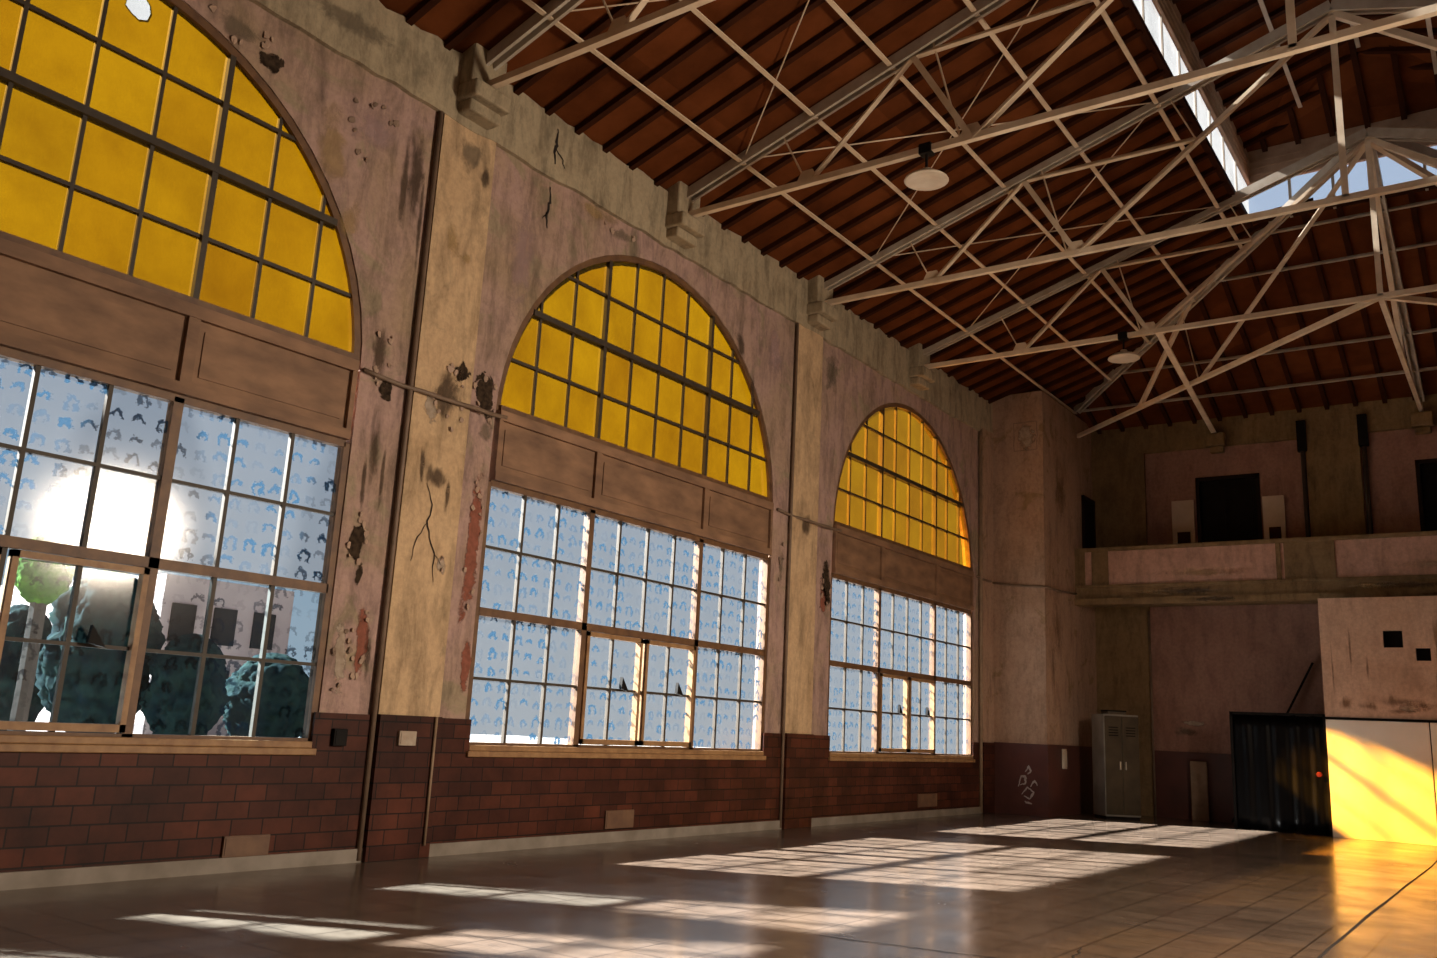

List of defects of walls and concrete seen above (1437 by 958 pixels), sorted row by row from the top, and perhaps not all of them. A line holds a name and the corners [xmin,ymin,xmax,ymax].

water stain [361,436,385,502]
water stain [420,454,450,507]